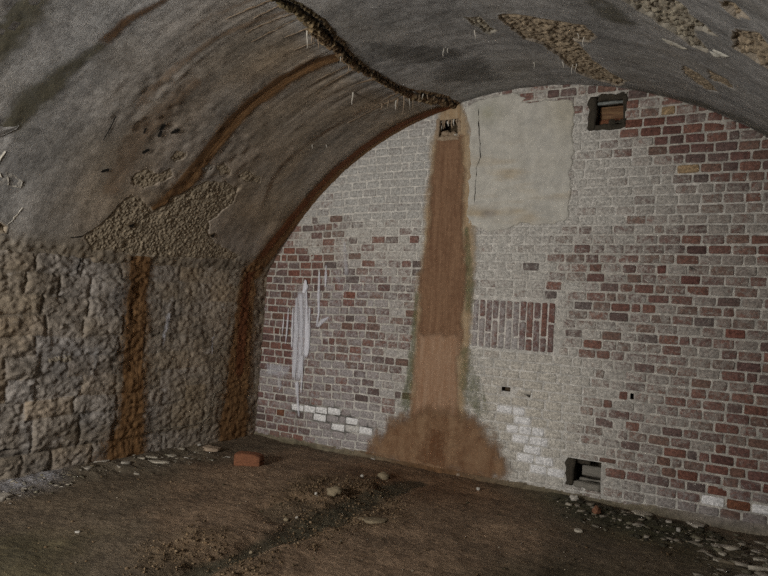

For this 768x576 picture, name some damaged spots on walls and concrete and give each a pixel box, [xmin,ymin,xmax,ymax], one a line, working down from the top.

flaking render [82,149,242,262]
rust [151,54,339,210]
crack [225,0,460,123]
flaking render [461,12,630,87]
flaking render [621,0,768,69]
rust [99,255,151,461]
efflorescence [267,265,329,413]
rust [218,104,506,479]